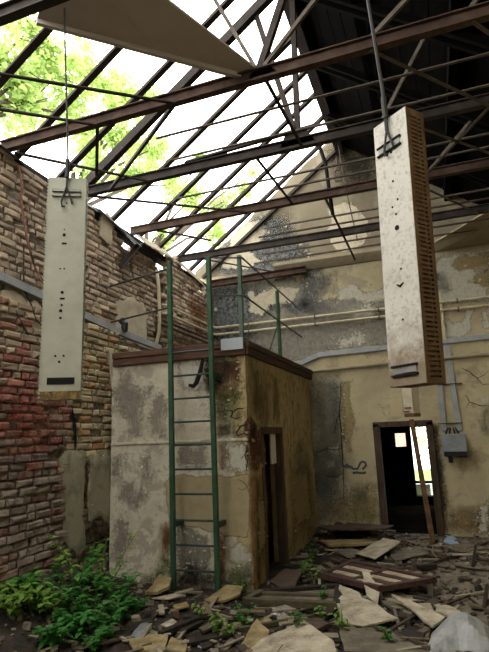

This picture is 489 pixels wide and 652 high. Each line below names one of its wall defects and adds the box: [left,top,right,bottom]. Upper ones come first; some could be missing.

damp [214,244,311,276]
damp [253,217,292,242]
peeling [327,202,368,230]
peeling [330,233,370,252]
damp [212,285,239,343]
peeling [212,276,387,361]
peeling [436,249,489,338]
crack [227,408,249,492]